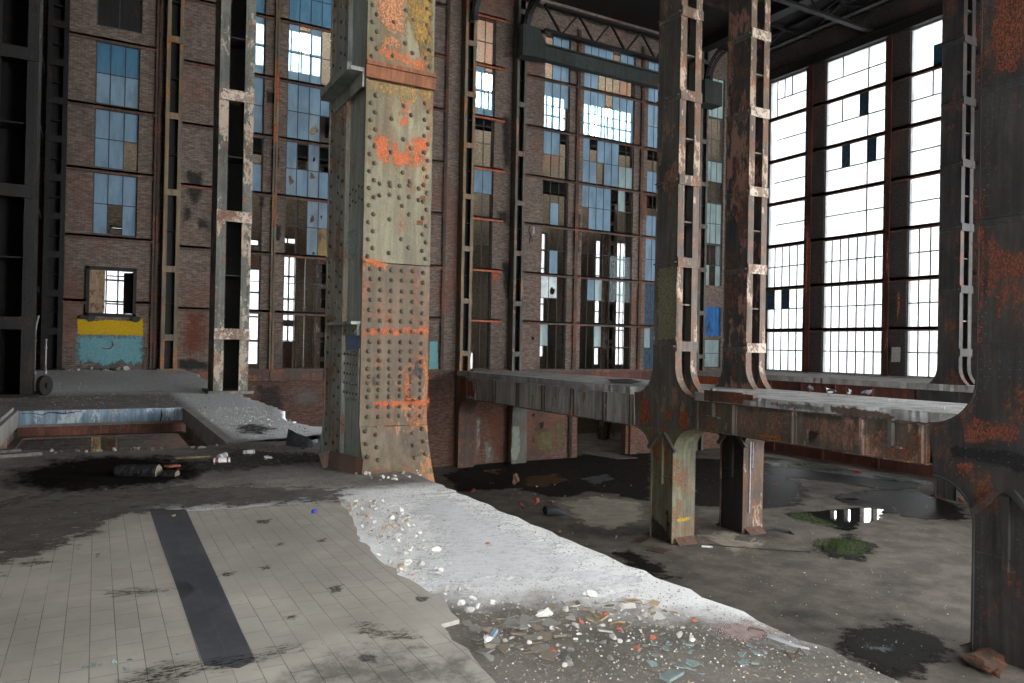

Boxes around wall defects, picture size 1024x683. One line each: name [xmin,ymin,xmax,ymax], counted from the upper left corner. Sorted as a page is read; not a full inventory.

rust [407,0,433,71]
peeling [74,316,144,368]
rust [651,510,671,543]
water stain [835,619,956,680]